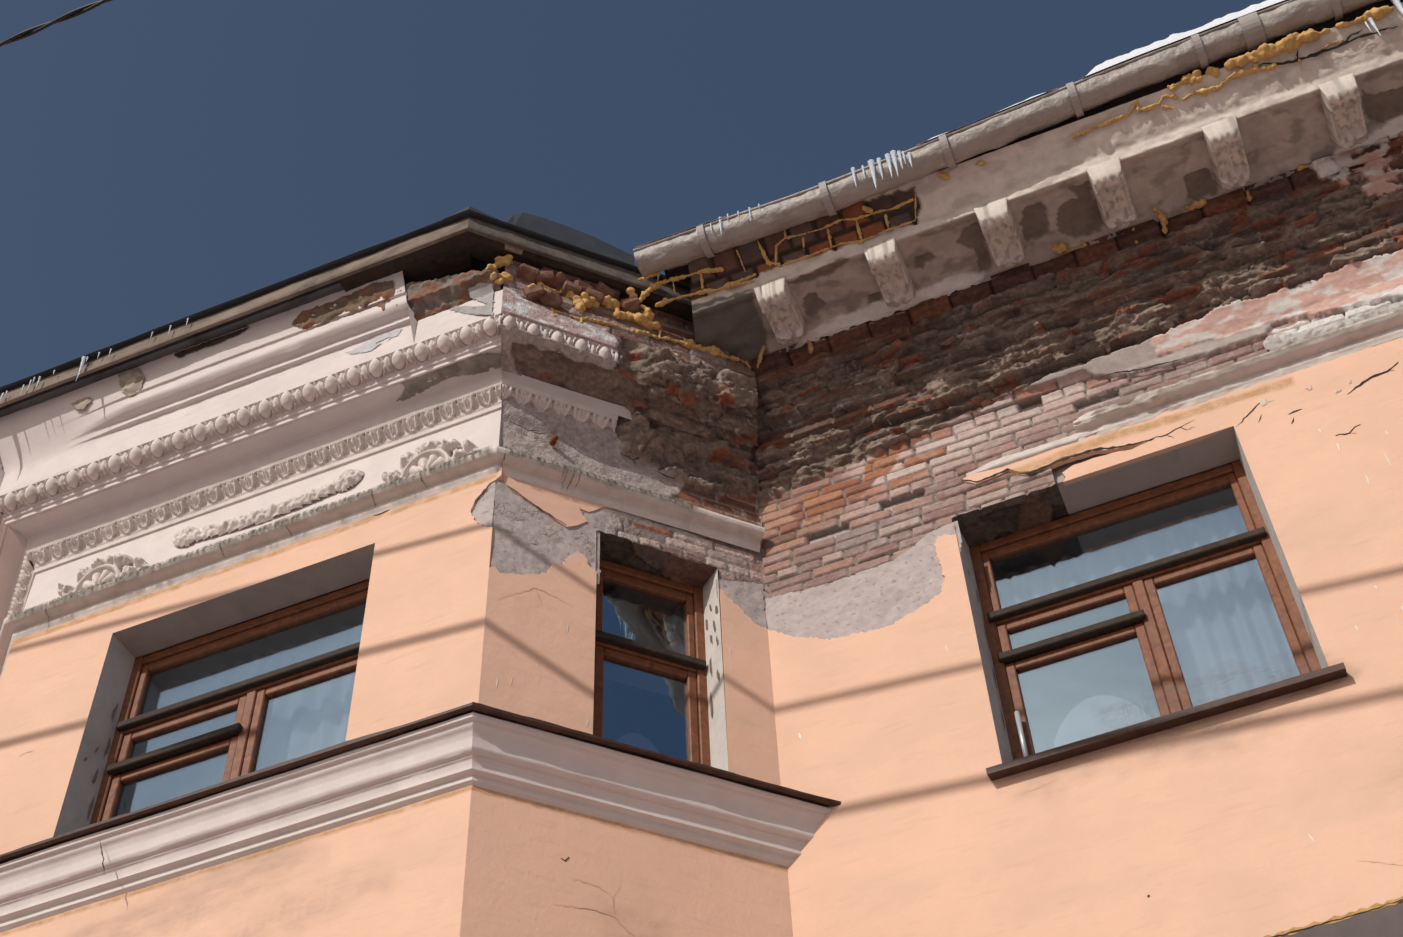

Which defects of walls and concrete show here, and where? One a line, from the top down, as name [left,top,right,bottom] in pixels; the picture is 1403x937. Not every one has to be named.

spalling [292,131,1403,717]
crack [1236,401,1301,427]
crack [1336,362,1398,436]